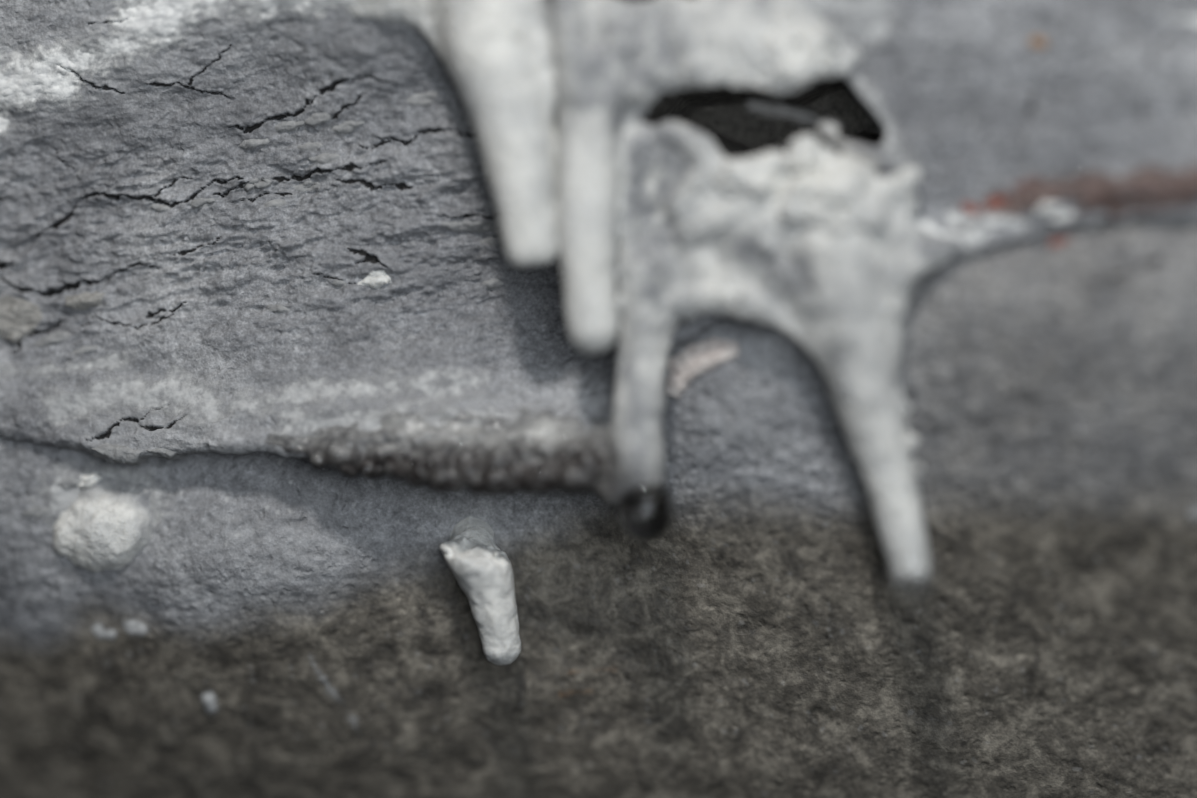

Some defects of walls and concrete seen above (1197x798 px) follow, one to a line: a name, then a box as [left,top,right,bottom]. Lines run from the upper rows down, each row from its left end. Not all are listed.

crack [76,44,232,96]
crack [228,75,397,133]
crack [30,128,476,238]
crack [440,212,497,220]
leakage [0,0,1027,356]
rust [961,166,1197,217]
crack [313,248,388,284]
crack [0,237,220,354]
leakage [39,464,167,530]